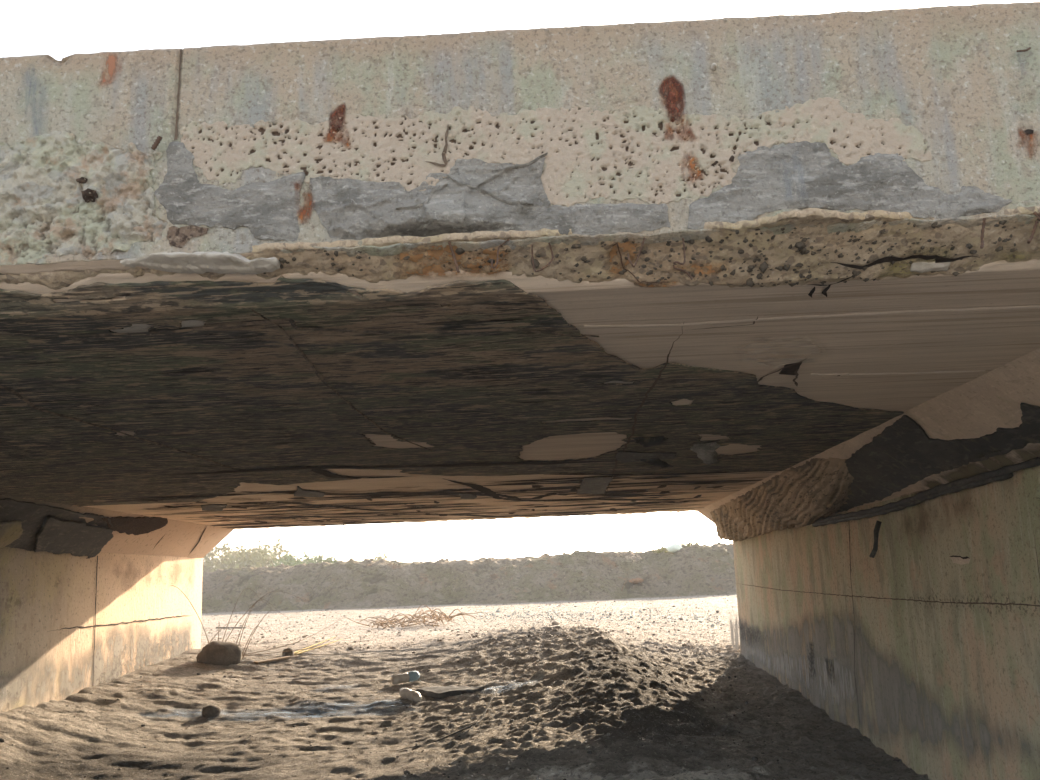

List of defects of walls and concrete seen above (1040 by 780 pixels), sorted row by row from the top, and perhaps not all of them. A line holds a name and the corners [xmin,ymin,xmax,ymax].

crack [174,49,182,140]
rust [325,105,349,147]
rust [660,77,695,141]
rust [684,156,702,181]
spalling [0,131,209,290]
rust [295,183,313,222]
rust [399,245,509,276]
spalling [245,206,1040,288]
peeling [520,432,627,460]
peeling [309,467,413,479]
peeling [456,475,617,514]
spalling [101,505,178,535]